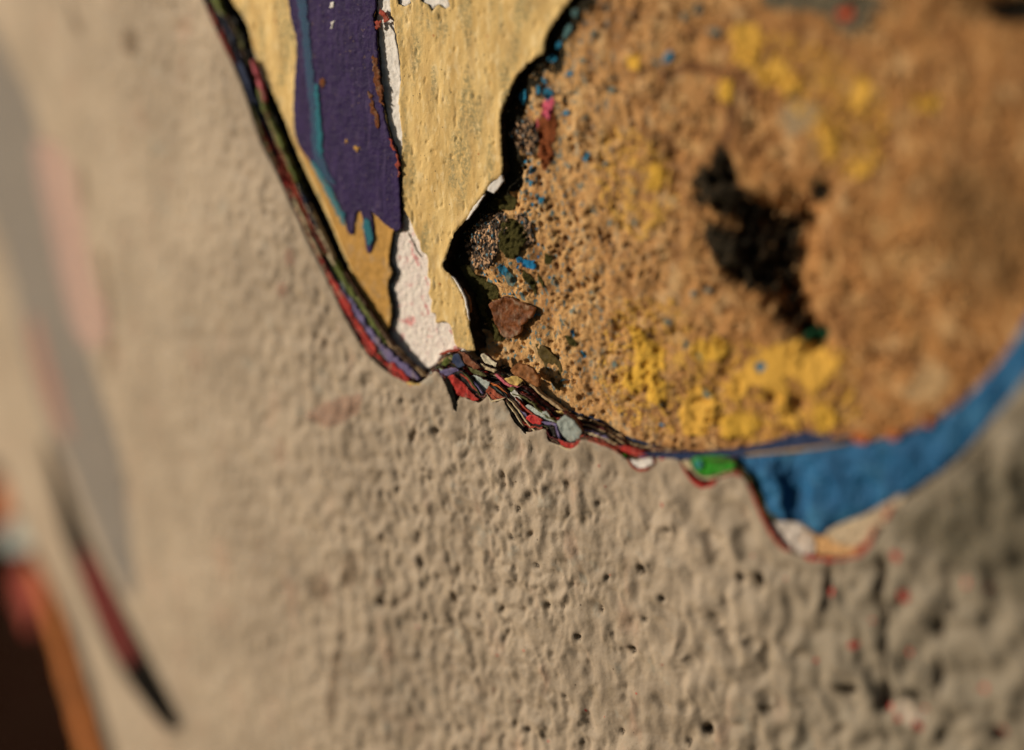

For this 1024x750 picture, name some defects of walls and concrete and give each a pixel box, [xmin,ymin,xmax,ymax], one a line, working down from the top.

peeling [205,0,1024,563]